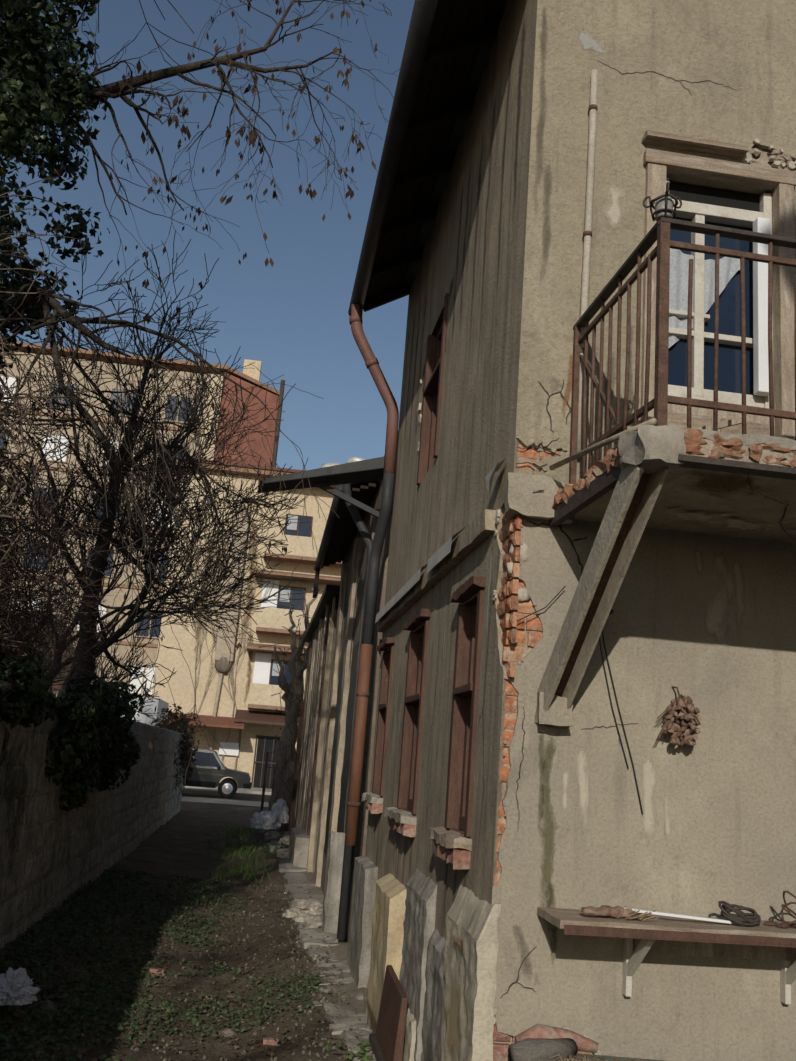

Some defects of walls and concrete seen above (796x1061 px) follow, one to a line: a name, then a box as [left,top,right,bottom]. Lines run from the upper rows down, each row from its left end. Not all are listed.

crack [597,60,736,95]
spalling [518,440,567,475]
crack [516,379,571,468]
spalling [552,447,621,508]
spalling [679,427,796,468]
spalling [493,509,543,785]
spalling [491,801,507,886]
water stain [539,736,589,908]